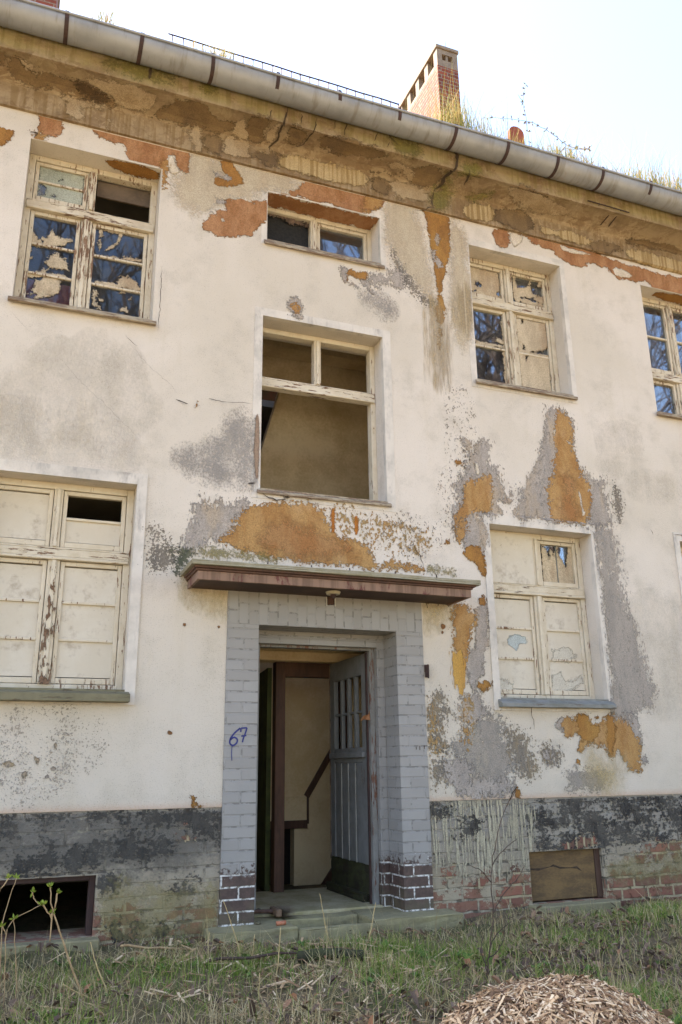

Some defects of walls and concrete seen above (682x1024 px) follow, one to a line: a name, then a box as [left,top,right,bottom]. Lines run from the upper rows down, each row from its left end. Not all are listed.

peeling [0,51,445,238]
damp [172,417,255,487]
peeling [38,572,57,684]
flaking render [179,386,658,799]
damp [430,799,536,886]